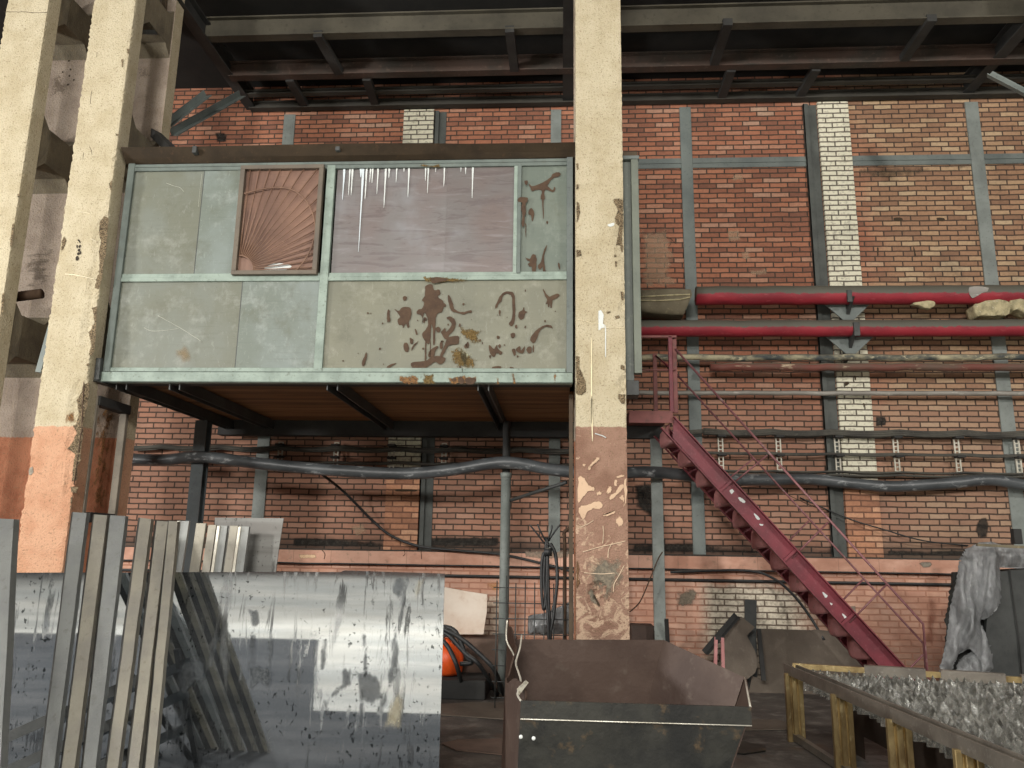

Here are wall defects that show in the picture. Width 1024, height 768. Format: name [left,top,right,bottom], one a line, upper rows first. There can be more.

spalling [95,216,109,289]
water stain [348,168,410,252]
spalling [614,198,624,267]
spalling [86,306,97,366]
rust [400,374,434,384]
rust [449,327,479,384]
spalling [576,356,586,395]
peeling [578,457,627,526]
spalling [576,562,600,606]